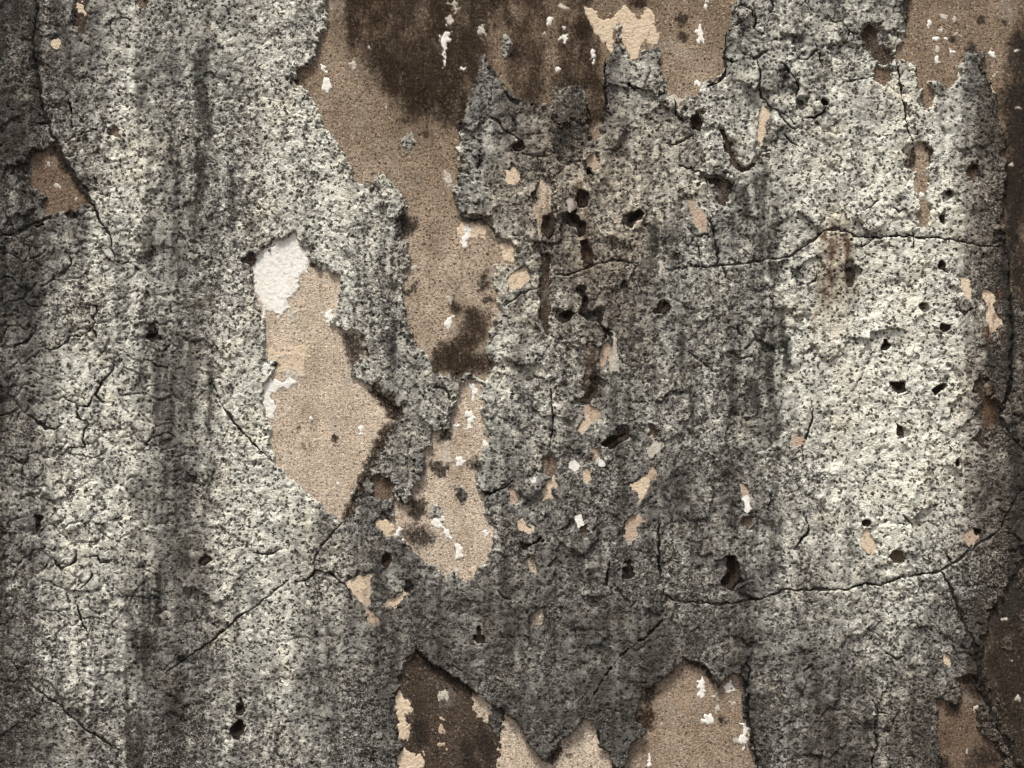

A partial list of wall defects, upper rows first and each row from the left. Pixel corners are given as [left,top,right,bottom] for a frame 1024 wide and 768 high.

flaking render [29,142,92,218]
water stain [343,0,605,128]
flaking render [861,0,1024,302]
crack [214,386,273,462]
water stain [432,300,491,380]
flaking render [248,0,738,583]
crack [681,200,1024,451]
crack [168,524,352,671]
flaking render [394,586,755,768]
crack [605,490,1023,768]